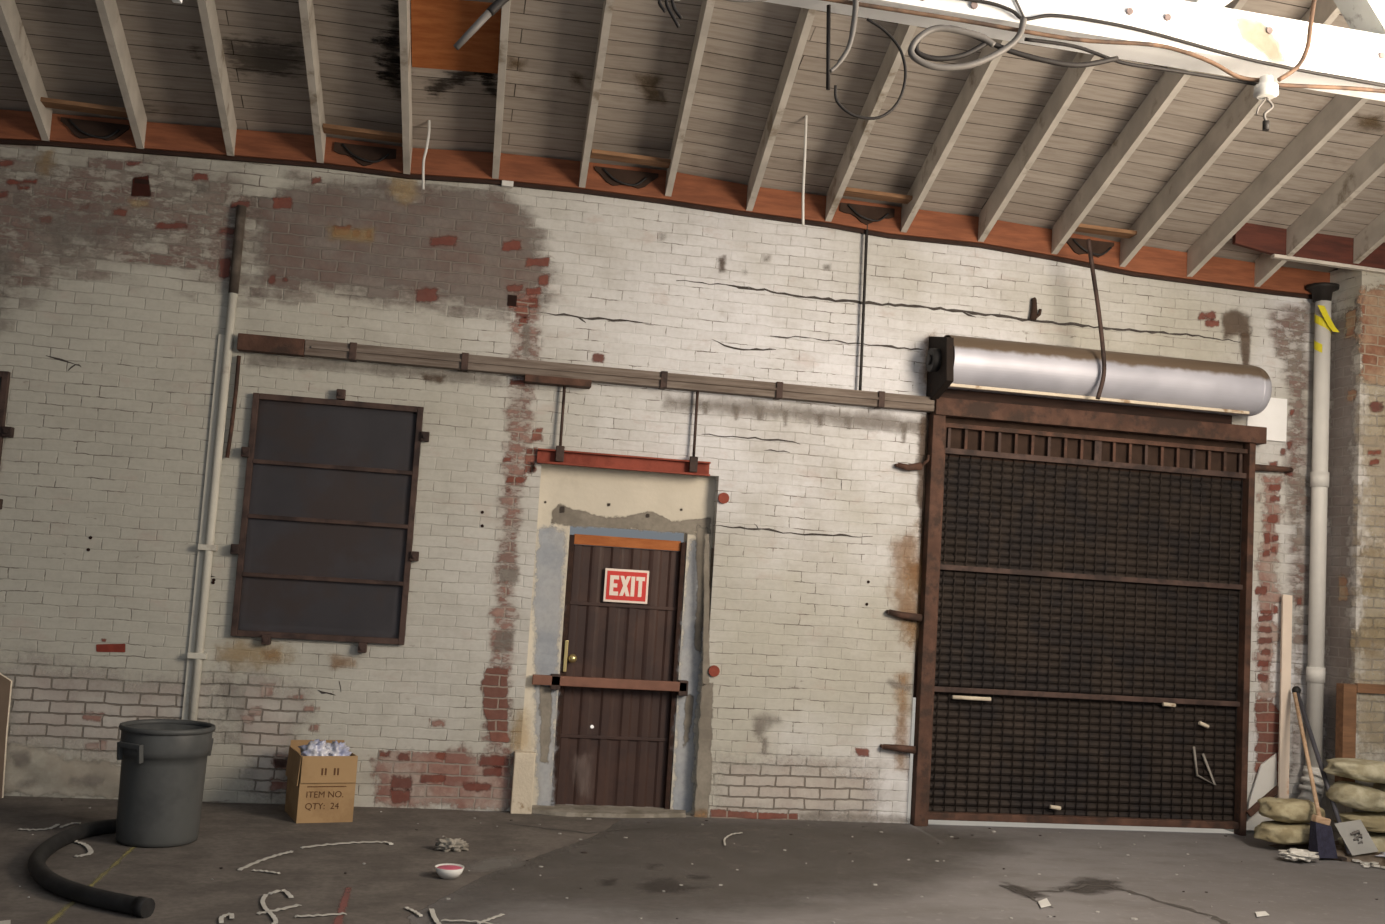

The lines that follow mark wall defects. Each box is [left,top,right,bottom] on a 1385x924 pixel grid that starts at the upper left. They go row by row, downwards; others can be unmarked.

water stain [372,2,401,97]
water stain [427,71,497,96]
peeling [0,146,550,360]
crack [538,312,651,324]
crack [712,336,924,351]
crack [676,280,1240,343]
peeling [371,376,910,822]
crack [714,525,873,537]
corrosion [895,417,928,635]
peeling [1254,307,1310,798]
peeling [1323,284,1385,759]
corrosion [891,676,908,765]